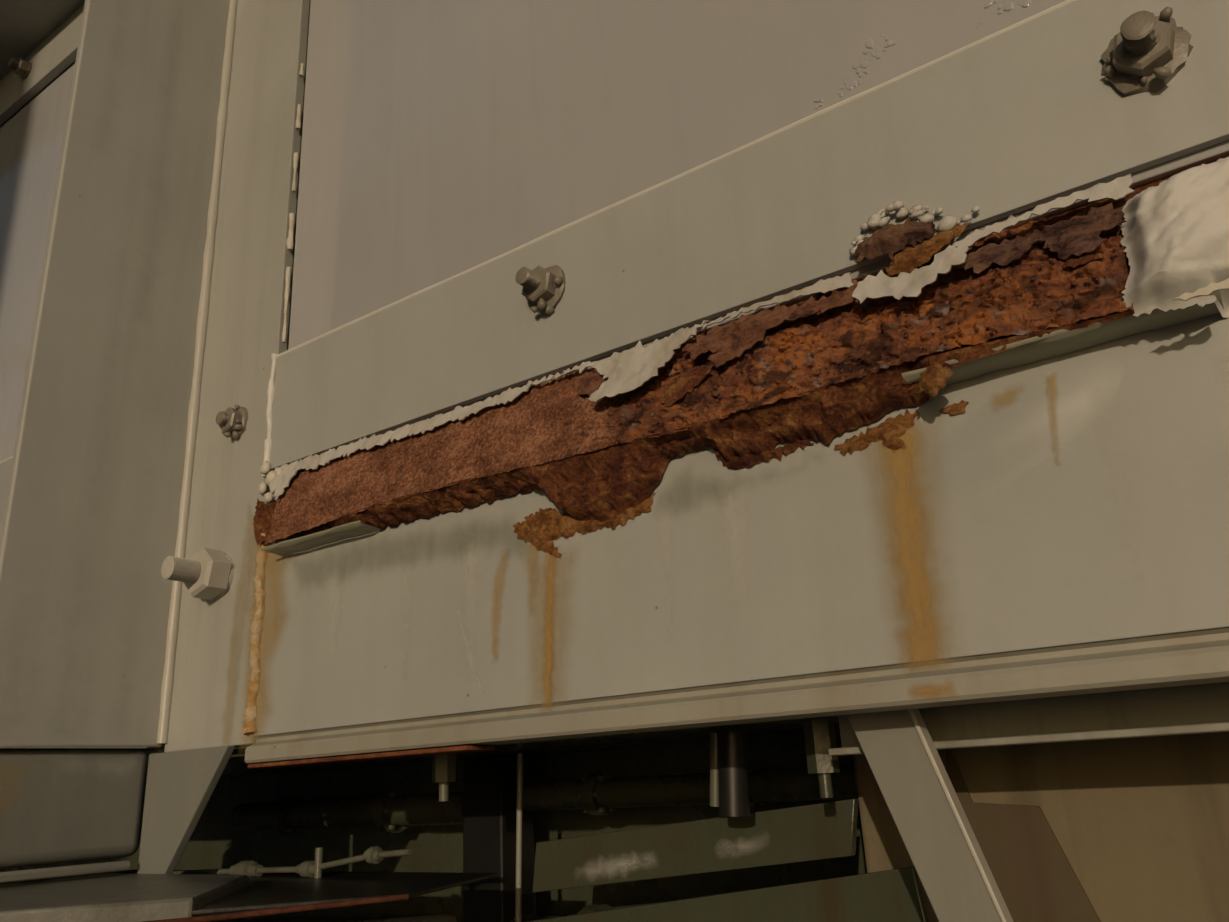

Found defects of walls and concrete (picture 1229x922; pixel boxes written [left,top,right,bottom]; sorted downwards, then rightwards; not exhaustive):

corrosion [243,201,1135,735]
peeling [269,173,1135,500]